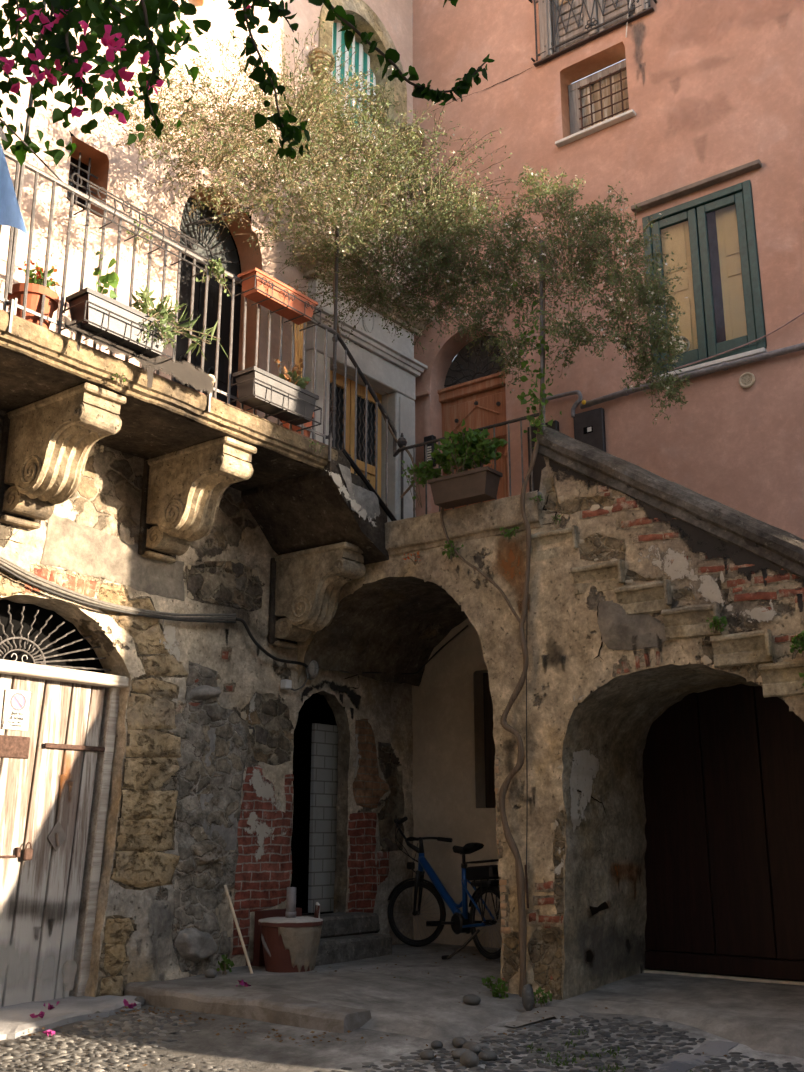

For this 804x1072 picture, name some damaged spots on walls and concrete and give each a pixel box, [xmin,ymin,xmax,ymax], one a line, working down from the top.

water stain [633,25,645,84]
peeling [326,470,377,527]
flaking render [543,477,804,644]
flaking render [612,645,663,677]
spalling [701,640,763,685]
rust [61,758,72,801]
flaking render [0,559,294,975]
spalling [347,719,405,913]
flaking render [495,757,503,859]
spalling [499,748,600,1000]
flaking render [95,915,137,997]